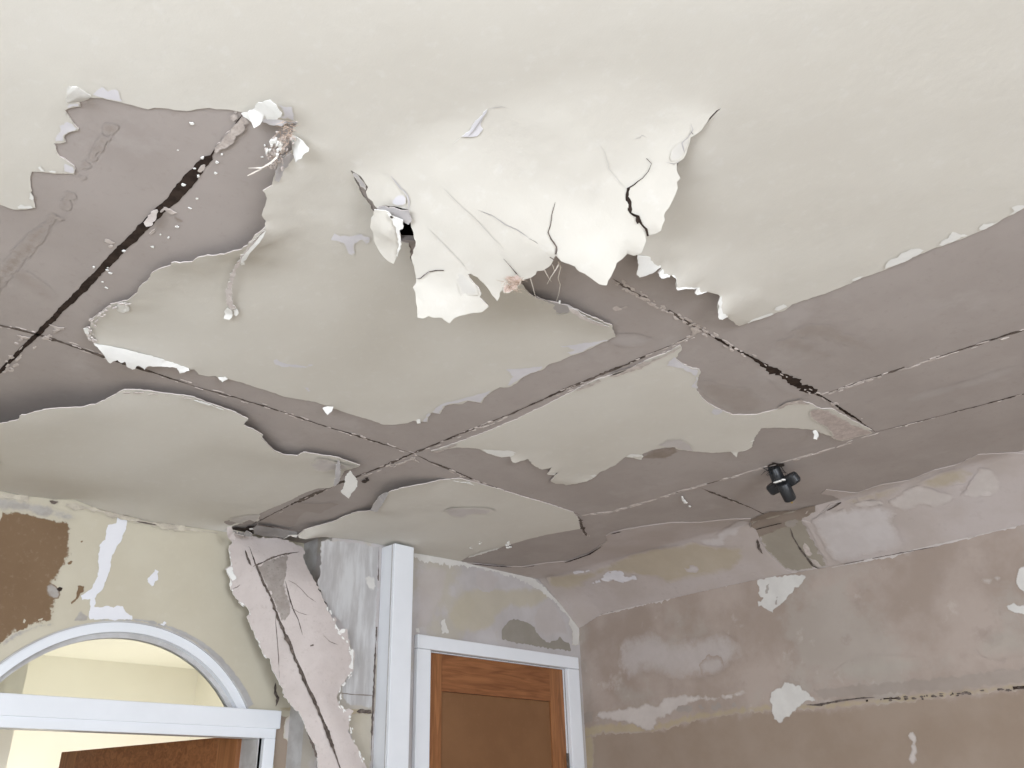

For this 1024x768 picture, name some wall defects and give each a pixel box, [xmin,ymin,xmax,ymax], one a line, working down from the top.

crack [0,111,1024,568]
peeling [341,471,358,498]
peeling [0,498,84,646]
peeling [255,554,291,621]